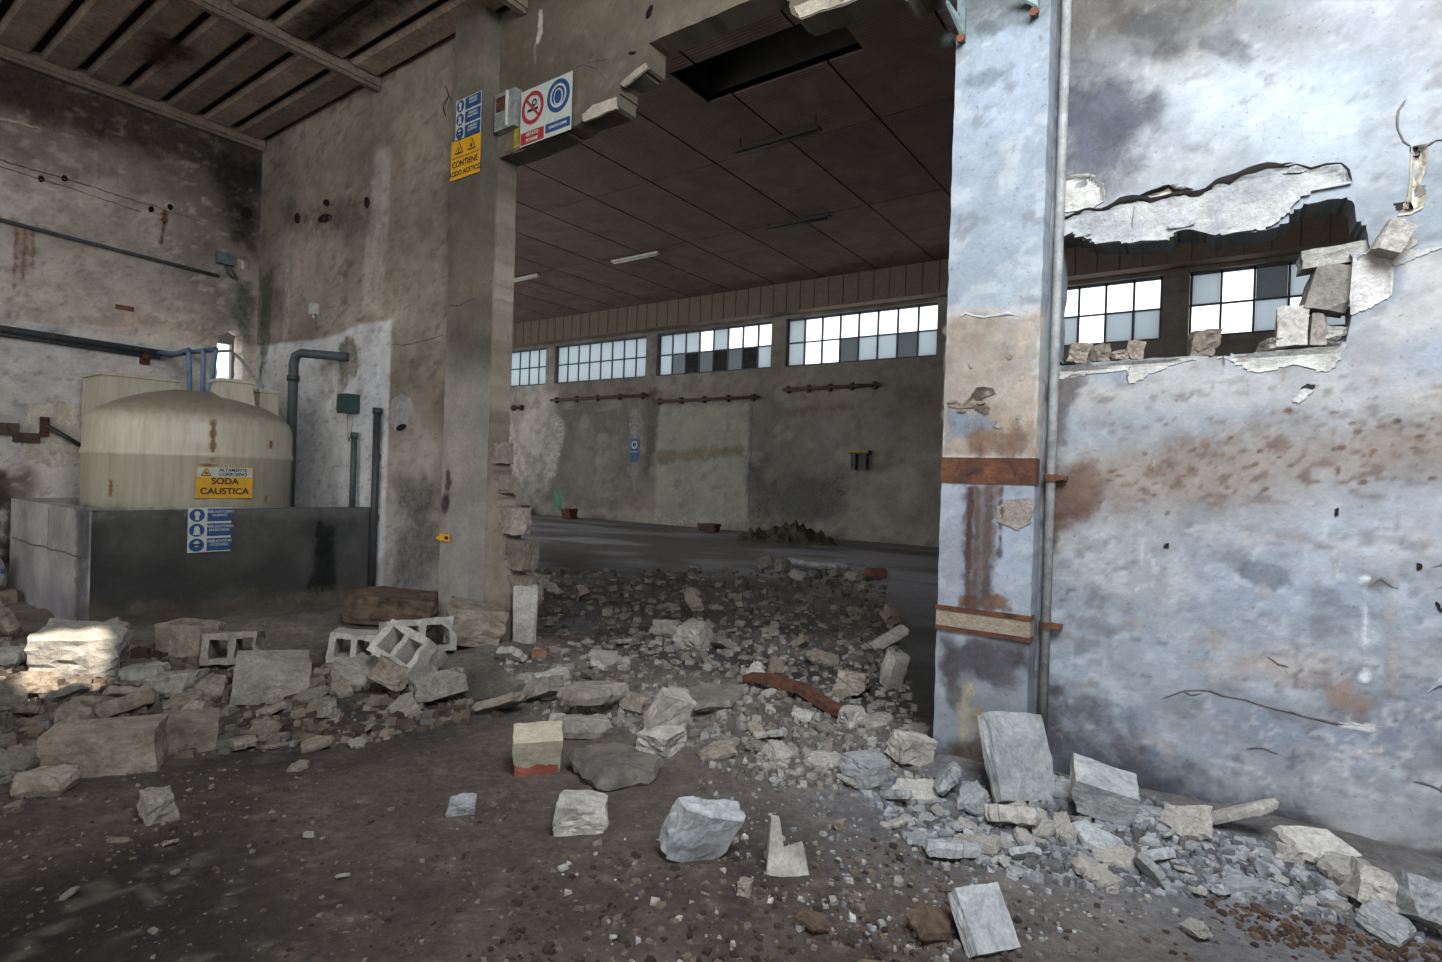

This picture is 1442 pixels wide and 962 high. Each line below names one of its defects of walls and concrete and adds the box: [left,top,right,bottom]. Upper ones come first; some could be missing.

damp [289,0,411,51]
spalling [793,0,852,18]
spalling [582,62,649,123]
spalling [1052,164,1351,246]
spalling [1059,358,1196,384]
spalling [1217,345,1346,404]
rust [935,486,1035,643]
crack [1164,689,1344,725]
crack [1415,781,1442,793]